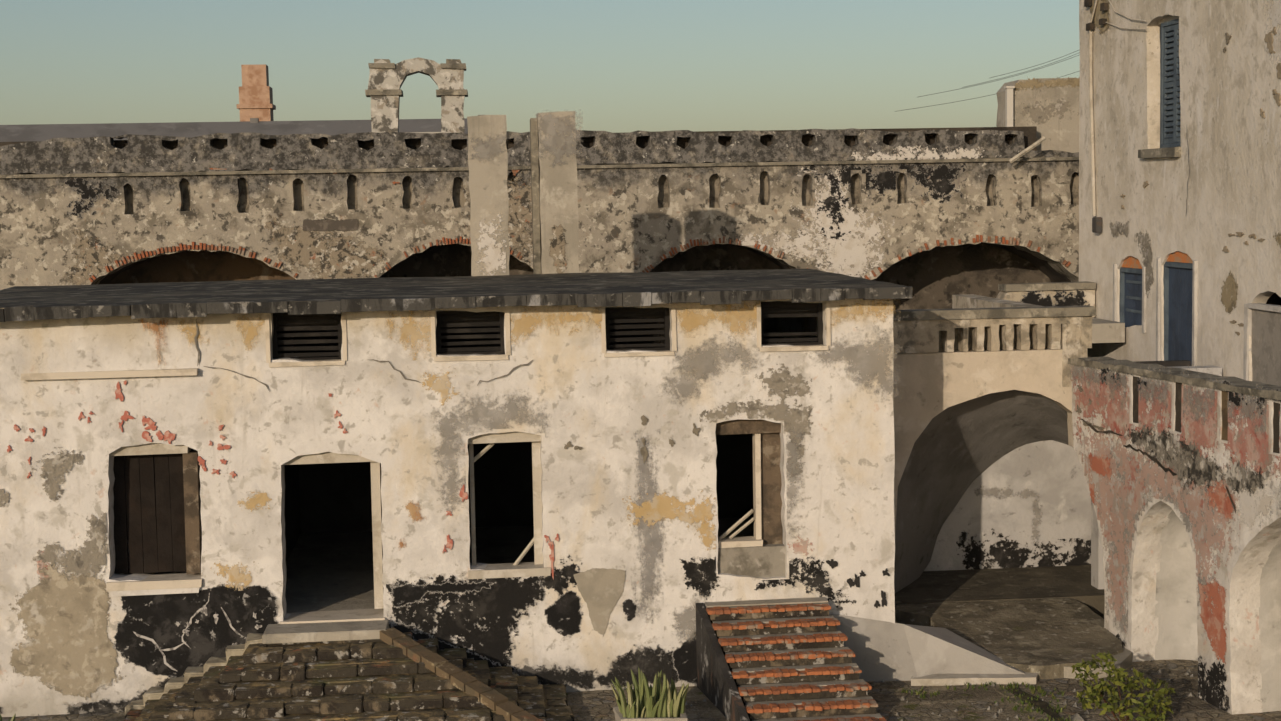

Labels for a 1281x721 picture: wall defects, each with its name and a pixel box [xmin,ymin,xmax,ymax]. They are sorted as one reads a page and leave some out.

spalling [1222,232,1281,252]
spalling [1219,270,1244,335]
peeling [7,424,85,502]
peeling [115,381,176,444]
peeling [198,425,236,478]
peeling [1071,365,1281,519]
peeling [9,513,122,700]
crack [133,593,242,672]
water stain [674,594,699,640]
peeling [1198,578,1228,664]
water stain [514,644,680,690]